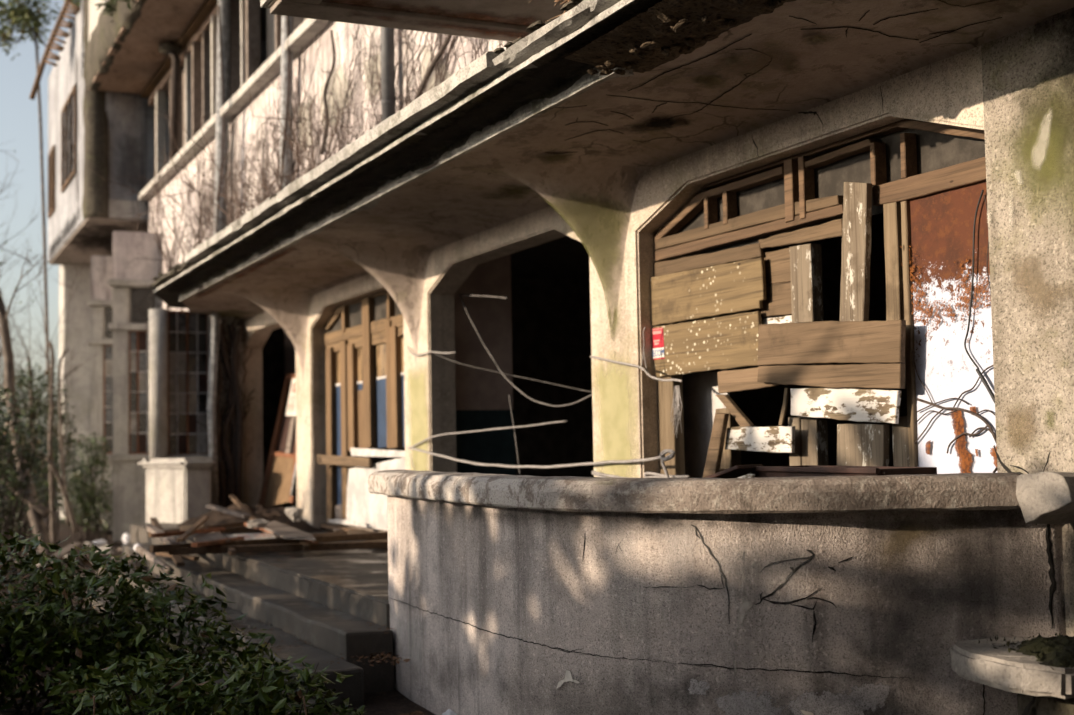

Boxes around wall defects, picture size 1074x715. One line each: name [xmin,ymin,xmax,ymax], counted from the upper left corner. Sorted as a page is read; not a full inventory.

spalling [565,0,796,76]
crack [789,0,1002,43]
water stain [1022,7,1074,162]
water stain [166,0,662,297]
water stain [632,119,688,132]
corrosion [900,246,991,337]
corrosion [950,406,998,473]
crack [645,525,854,642]
crack [1036,524,1057,628]
crack [391,598,908,678]
peeling [688,678,891,715]